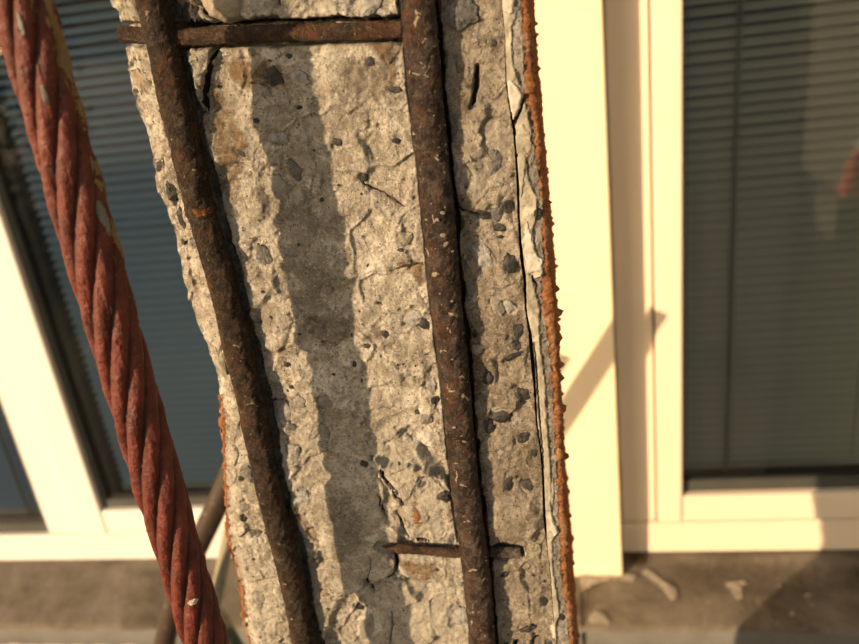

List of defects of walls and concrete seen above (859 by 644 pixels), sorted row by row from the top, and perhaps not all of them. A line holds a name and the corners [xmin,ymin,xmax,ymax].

crack [201,0,401,25]
flaking render [503,0,515,14]
crack [202,47,222,111]
corrosion [200,94,246,262]
flaking render [507,80,532,197]
flaking render [524,221,543,273]
corrosion [436,0,499,644]
crack [501,0,555,644]
corrosion [243,283,325,644]
spalling [345,421,451,542]
crack [366,469,430,588]
corrosion [400,560,441,580]